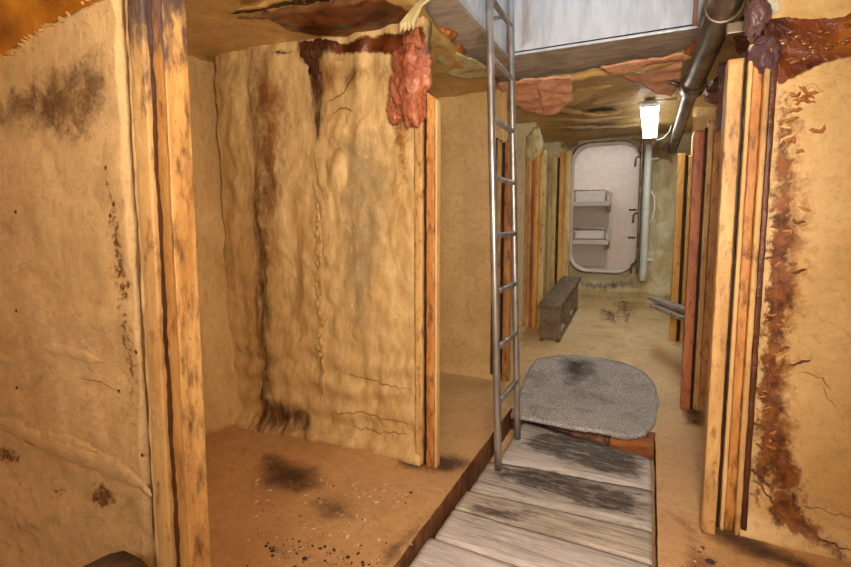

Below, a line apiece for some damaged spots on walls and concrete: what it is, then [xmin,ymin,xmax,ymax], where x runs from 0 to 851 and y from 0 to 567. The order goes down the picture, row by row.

peeling [0,0,99,59]
peeling [765,0,851,84]
water stain [11,71,102,125]
crack [329,71,358,114]
rust [740,63,842,559]
crack [318,351,409,435]
rust [92,482,117,508]